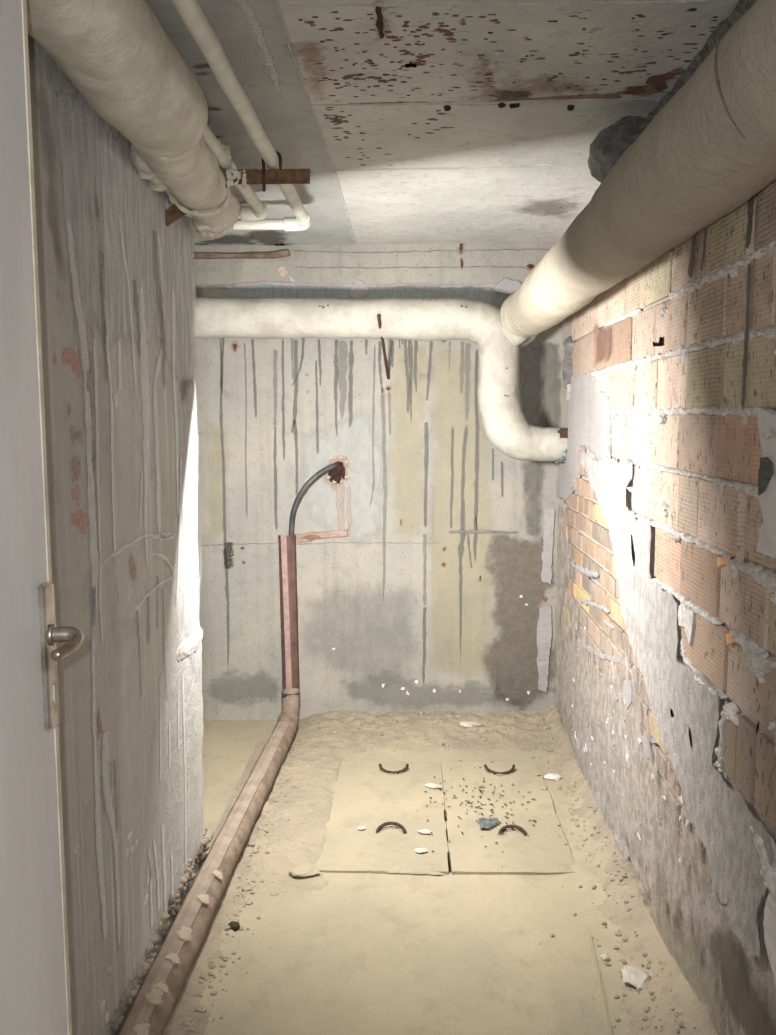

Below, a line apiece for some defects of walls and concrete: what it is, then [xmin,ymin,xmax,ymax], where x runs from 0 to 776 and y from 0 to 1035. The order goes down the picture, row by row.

corrosion [298,6,718,165]
water stain [521,344,560,428]
water stain [42,74,522,944]
water stain [485,461,554,707]
peeling [536,336,612,692]
peeling [678,604,696,646]
peeling [757,408,776,559]